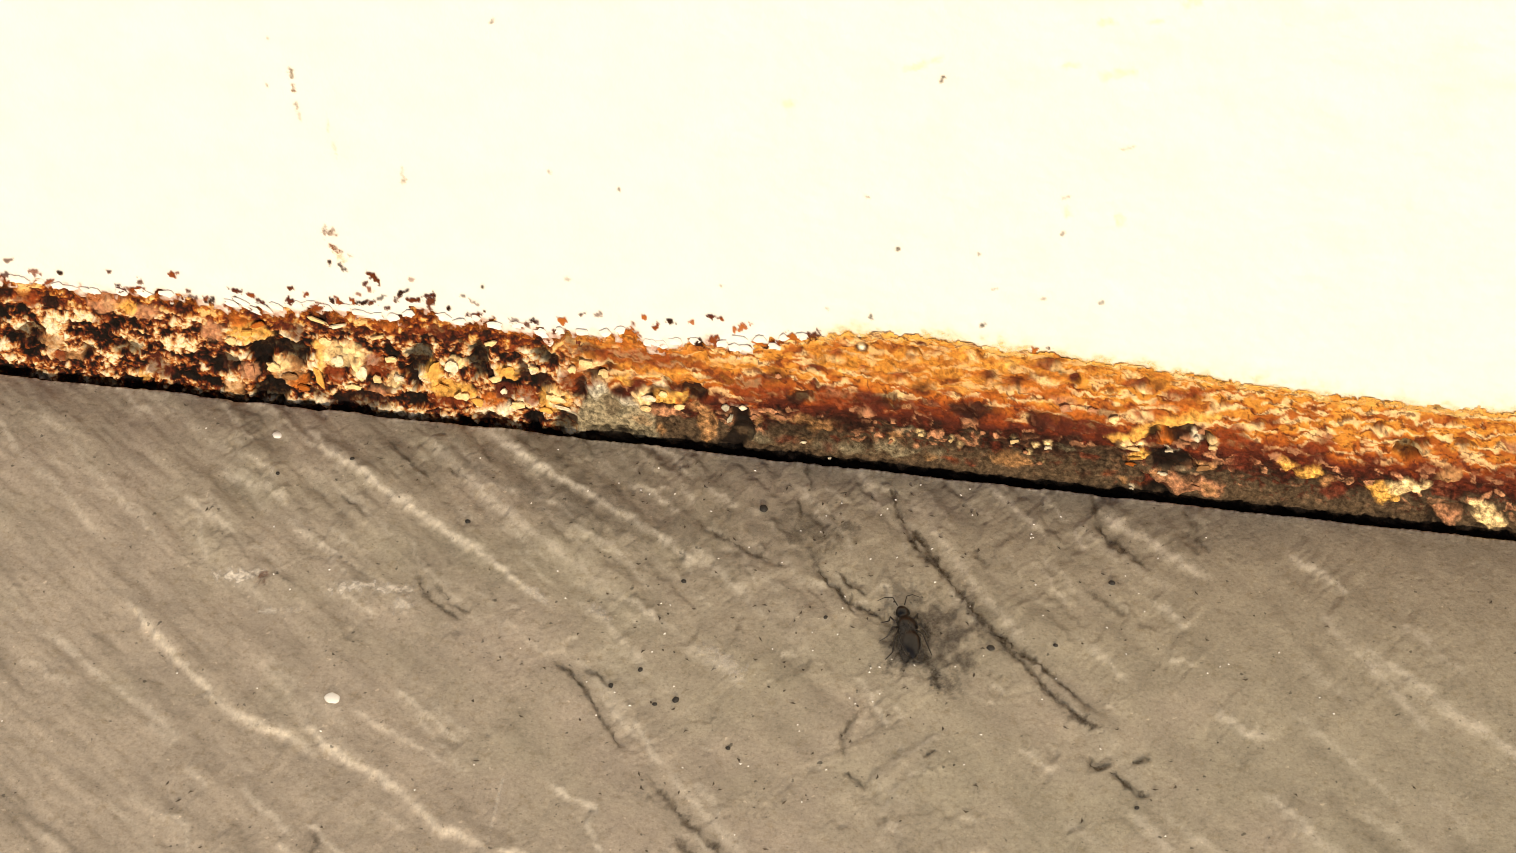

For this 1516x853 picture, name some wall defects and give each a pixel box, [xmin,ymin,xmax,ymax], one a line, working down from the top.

corrosion [573,329,1516,485]